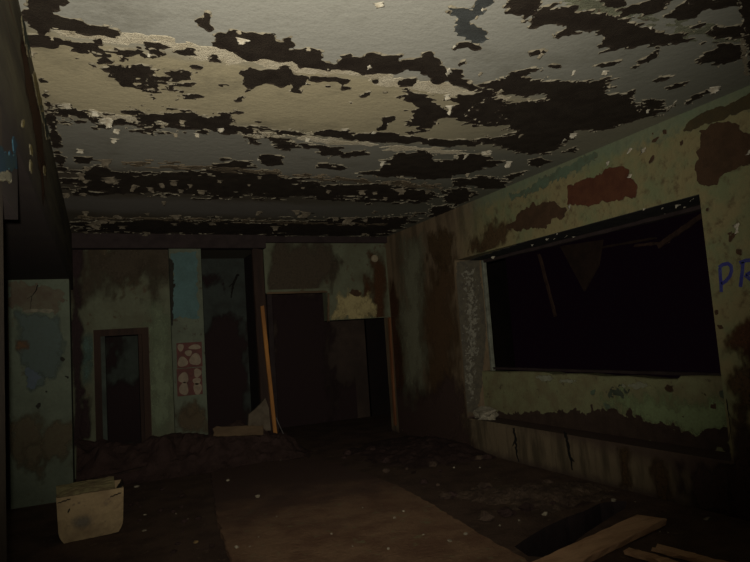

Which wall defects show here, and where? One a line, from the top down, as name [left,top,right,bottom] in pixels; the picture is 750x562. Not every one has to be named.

peeling [21,0,750,413]
peeling [497,381,730,453]